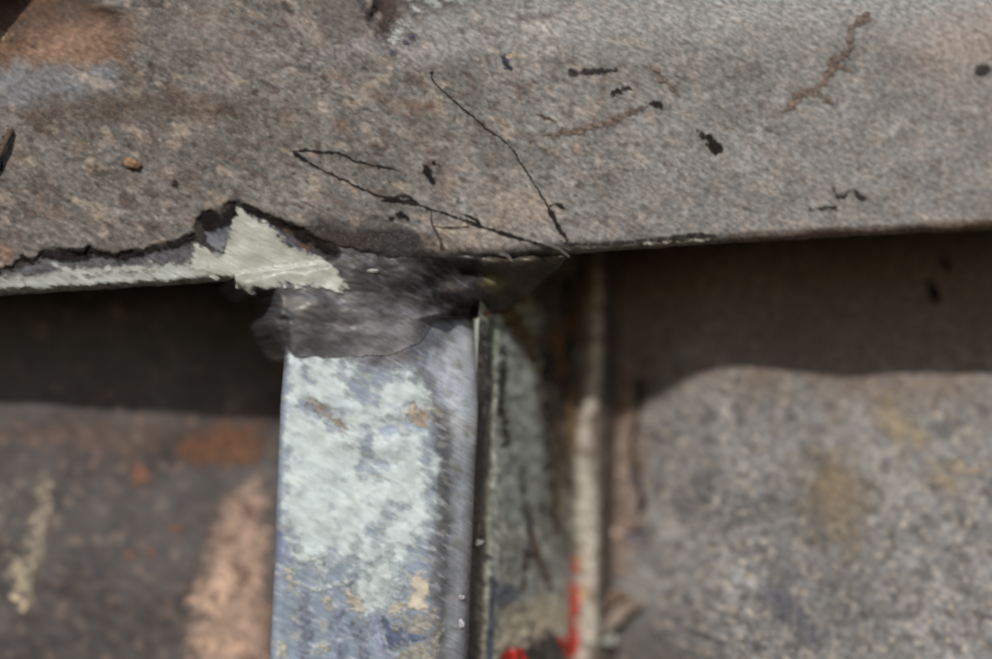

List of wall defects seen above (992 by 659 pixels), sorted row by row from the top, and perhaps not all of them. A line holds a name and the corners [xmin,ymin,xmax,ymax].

peeling [386,0,468,54]
peeling [0,201,350,294]
crack [292,71,568,250]
peeling [280,354,442,659]